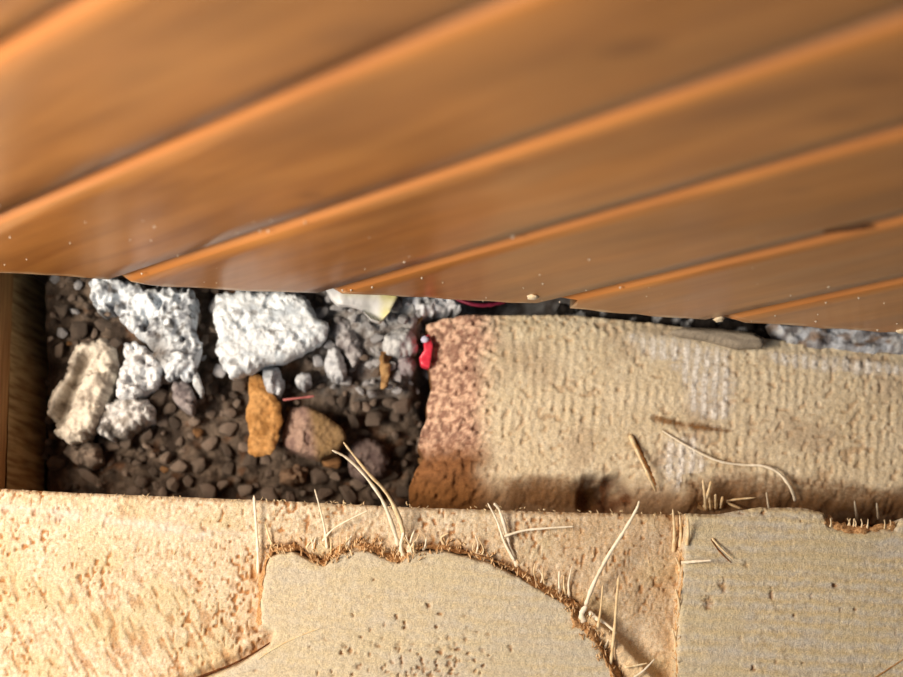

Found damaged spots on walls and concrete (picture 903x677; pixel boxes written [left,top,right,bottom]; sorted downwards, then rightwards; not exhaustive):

spalling [824,515,895,535]